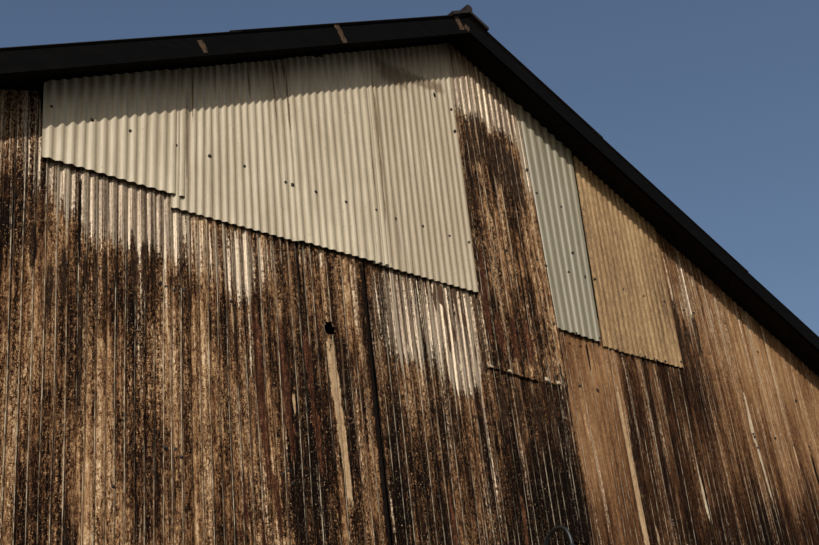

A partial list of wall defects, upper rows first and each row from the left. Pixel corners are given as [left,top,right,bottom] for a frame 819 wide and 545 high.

corrosion [463,110,528,216]
corrosion [29,221,38,270]
corrosion [45,247,67,320]
corrosion [478,244,534,367]
corrosion [671,296,703,390]
corrosion [250,297,283,540]
corrosion [302,331,324,479]
corrosion [359,263,393,545]
corrosion [627,411,649,521]